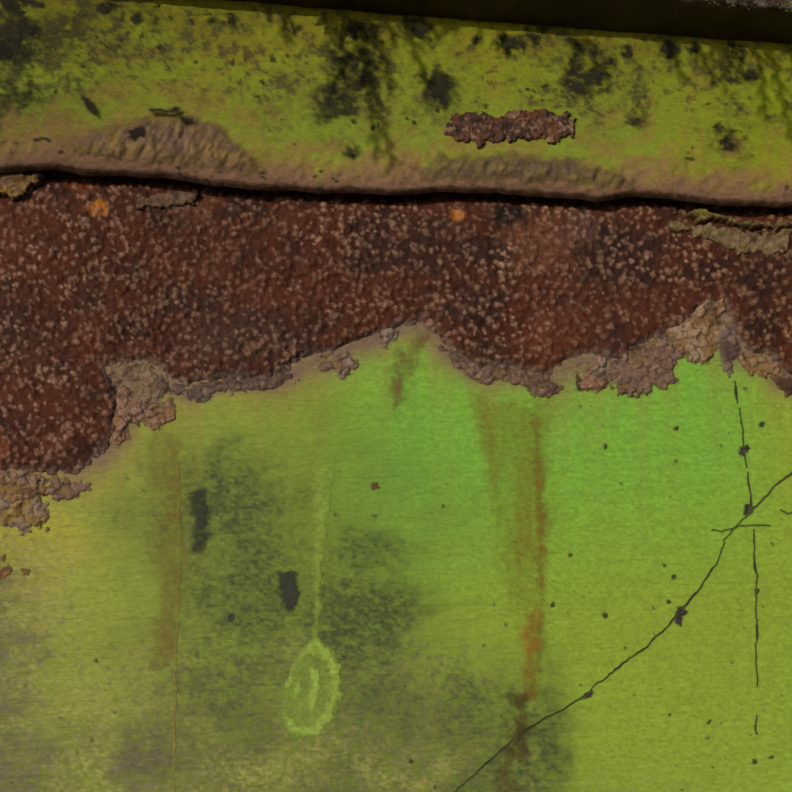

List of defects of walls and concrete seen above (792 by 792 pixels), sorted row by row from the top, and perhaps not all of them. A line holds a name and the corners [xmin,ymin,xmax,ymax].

mould [0,0,44,60]
mould [315,19,384,122]
mould [423,68,455,108]
mould [494,27,548,54]
mould [555,42,616,96]
mould [660,40,700,59]
mould [726,70,757,83]
mould [716,124,736,151]
crack [455,358,792,792]